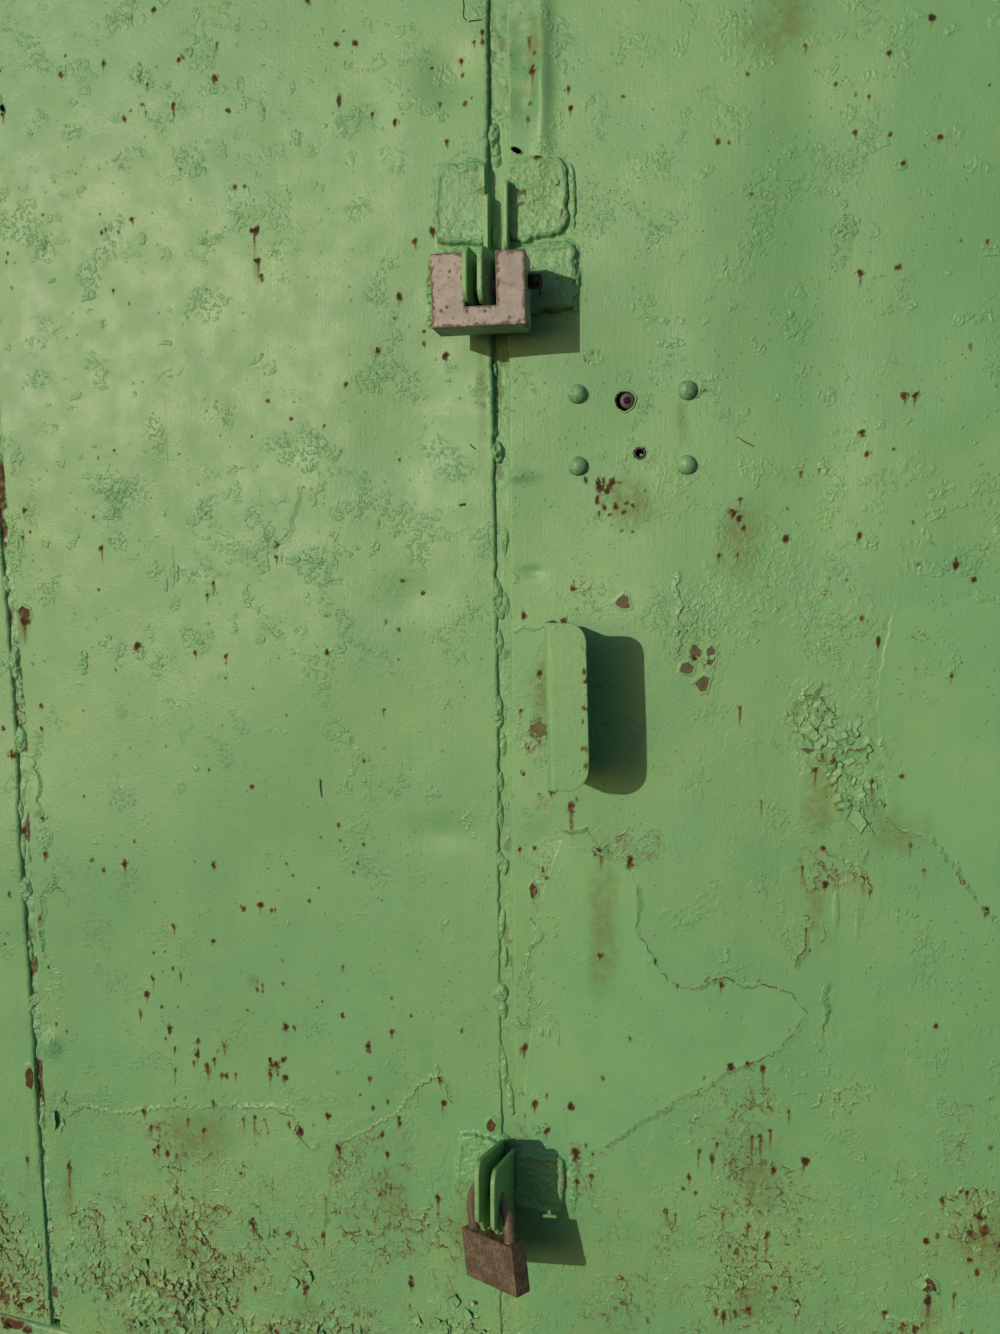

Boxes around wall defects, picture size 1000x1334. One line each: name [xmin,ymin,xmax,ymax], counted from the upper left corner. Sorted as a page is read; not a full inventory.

rust [249,225,263,282]
rust [584,477,635,516]
peeling [670,580,738,696]
crack [825,787,1000,924]
rust [268,1057,288,1081]
crack [558,825,833,1213]
crack [58,1061,457,1231]
peeling [0,1002,1000,1334]